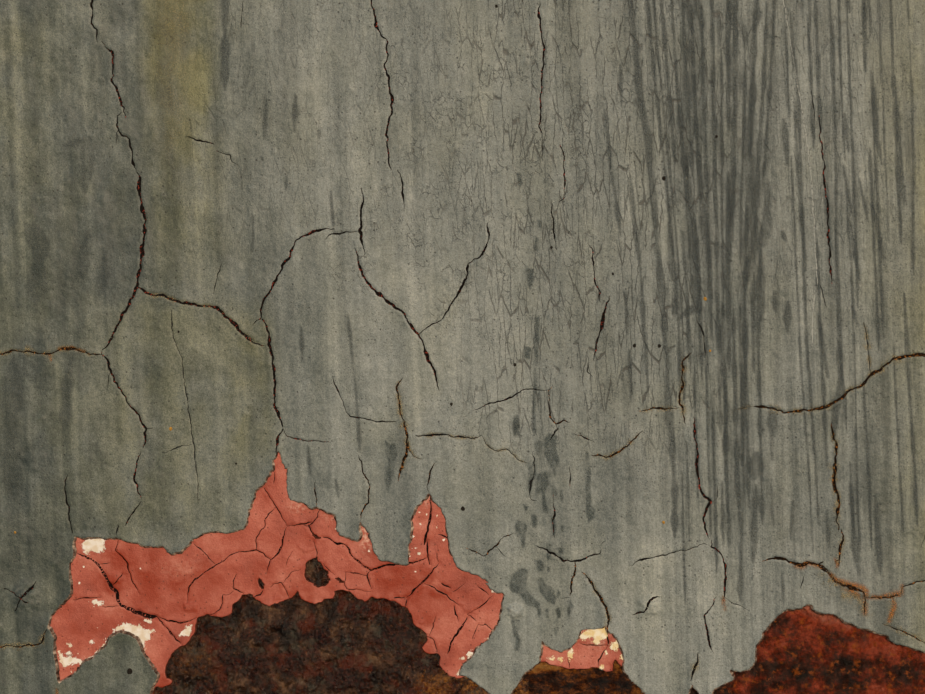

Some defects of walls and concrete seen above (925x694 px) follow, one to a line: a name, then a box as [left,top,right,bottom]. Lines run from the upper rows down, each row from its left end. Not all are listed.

crack [0,0,490,534]
crack [522,0,566,250]
leakage [647,0,775,568]
leakage [783,14,822,155]
leakage [825,28,914,345]
peeling [50,452,503,694]
corrosion [155,557,488,694]
crack [332,322,749,680]
corrosion [512,661,644,694]
peeling [541,627,623,672]
corrosion [714,606,925,694]
crack [736,325,925,642]